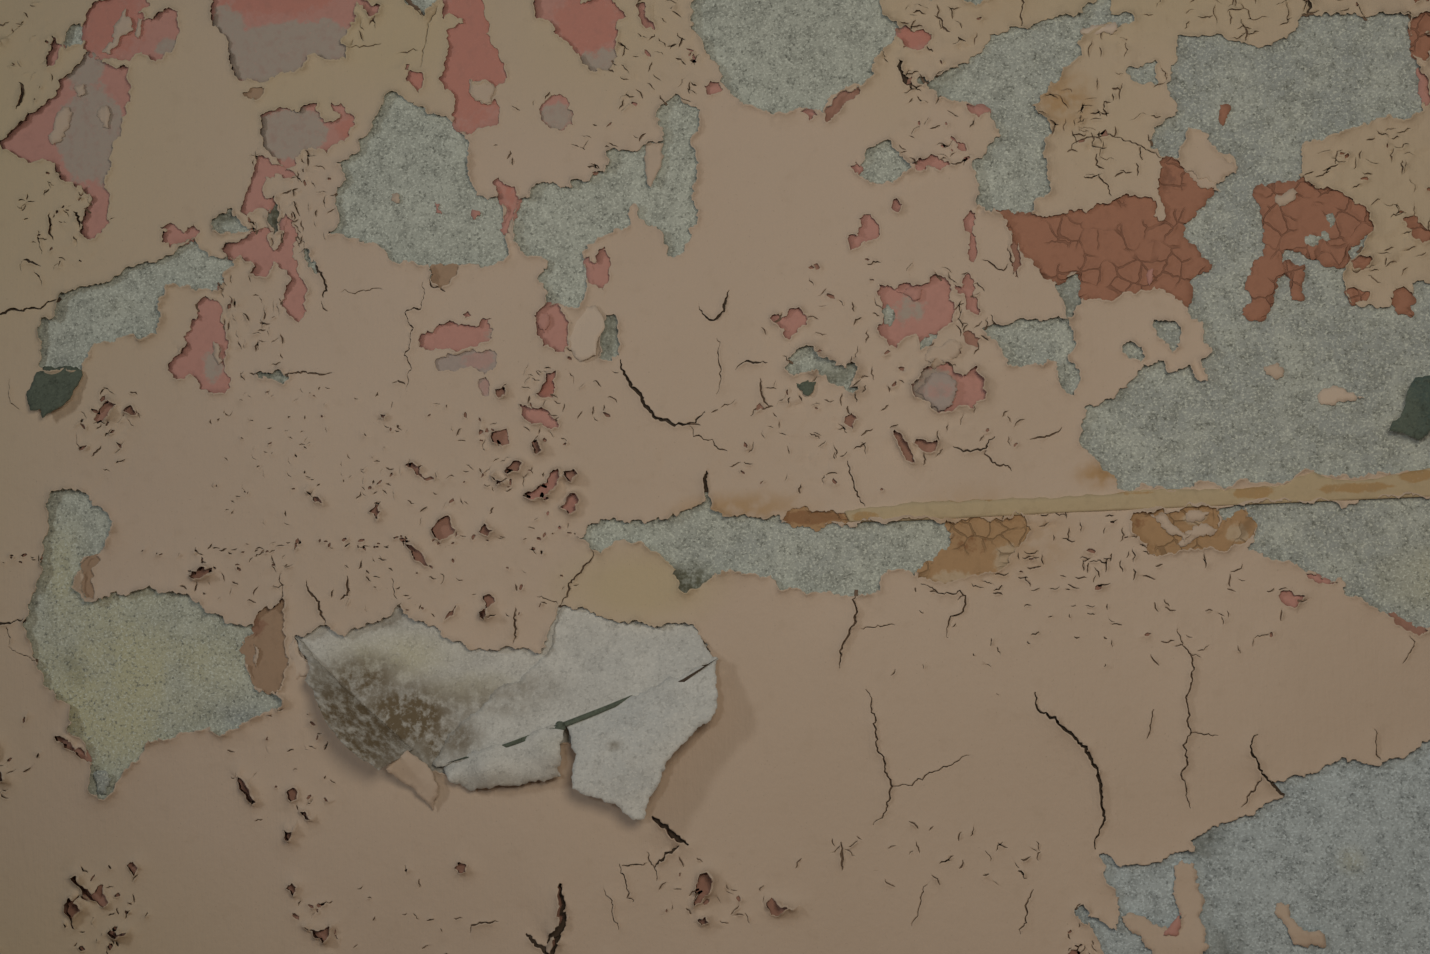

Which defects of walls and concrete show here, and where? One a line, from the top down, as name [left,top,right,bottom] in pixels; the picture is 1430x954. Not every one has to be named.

crack [0,201,83,315]
peeling [0,0,1430,596]
peeling [3,488,718,821]
crack [866,690,966,825]
peeling [958,512,1163,647]
crack [1034,692,1106,849]
crack [1147,632,1285,808]
peeling [1238,587,1306,653]
peeling [1228,497,1430,636]
crack [446,883,567,954]
crack [604,816,689,930]
peeling [1068,740,1430,954]